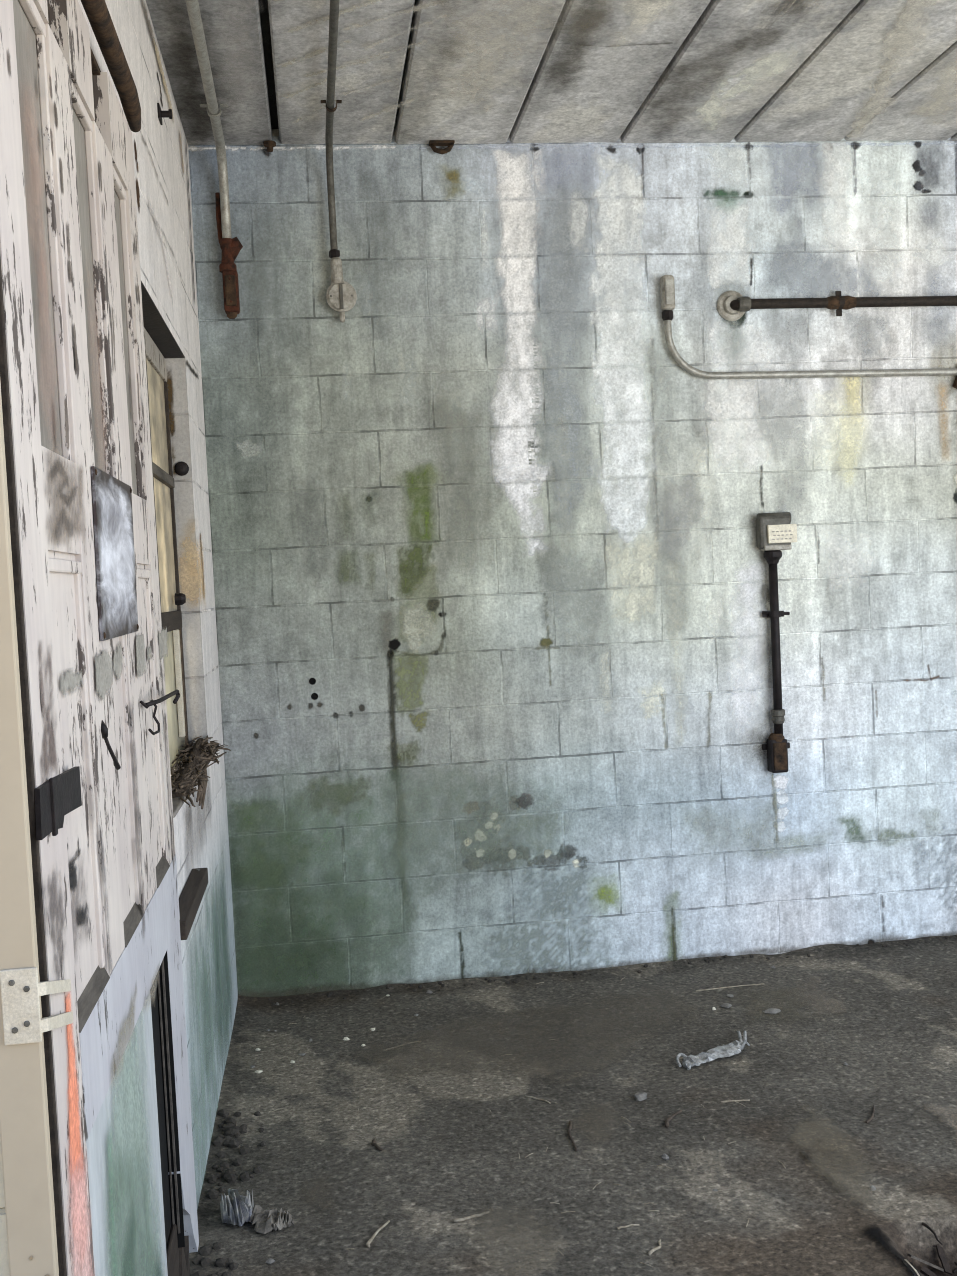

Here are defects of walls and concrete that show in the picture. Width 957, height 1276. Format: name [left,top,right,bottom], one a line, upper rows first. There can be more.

peeling [49,76,64,193]
peeling [141,0,173,114]
water stain [631,0,668,26]
water stain [652,31,788,129]
water stain [475,145,702,620]
peeling [48,399,85,542]
water stain [399,545,432,593]
peeling [39,646,83,776]
peeling [133,742,145,926]
peeling [49,844,88,978]